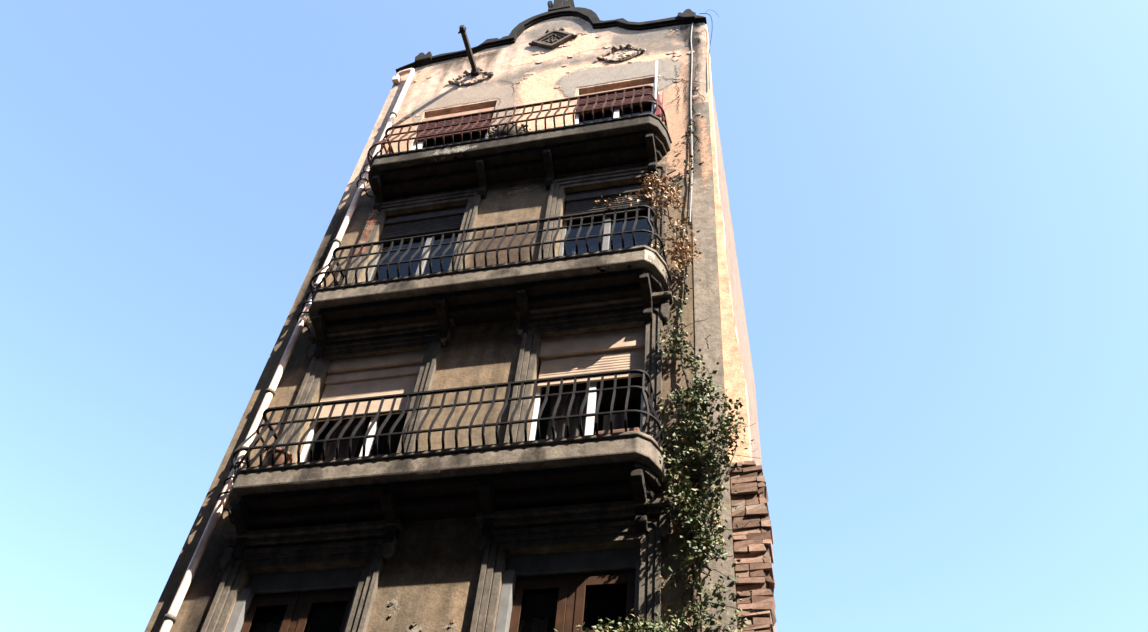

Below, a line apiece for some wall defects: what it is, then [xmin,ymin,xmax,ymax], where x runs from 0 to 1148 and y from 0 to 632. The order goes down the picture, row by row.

flaking render [414,66,434,83]
flaking render [501,31,712,187]